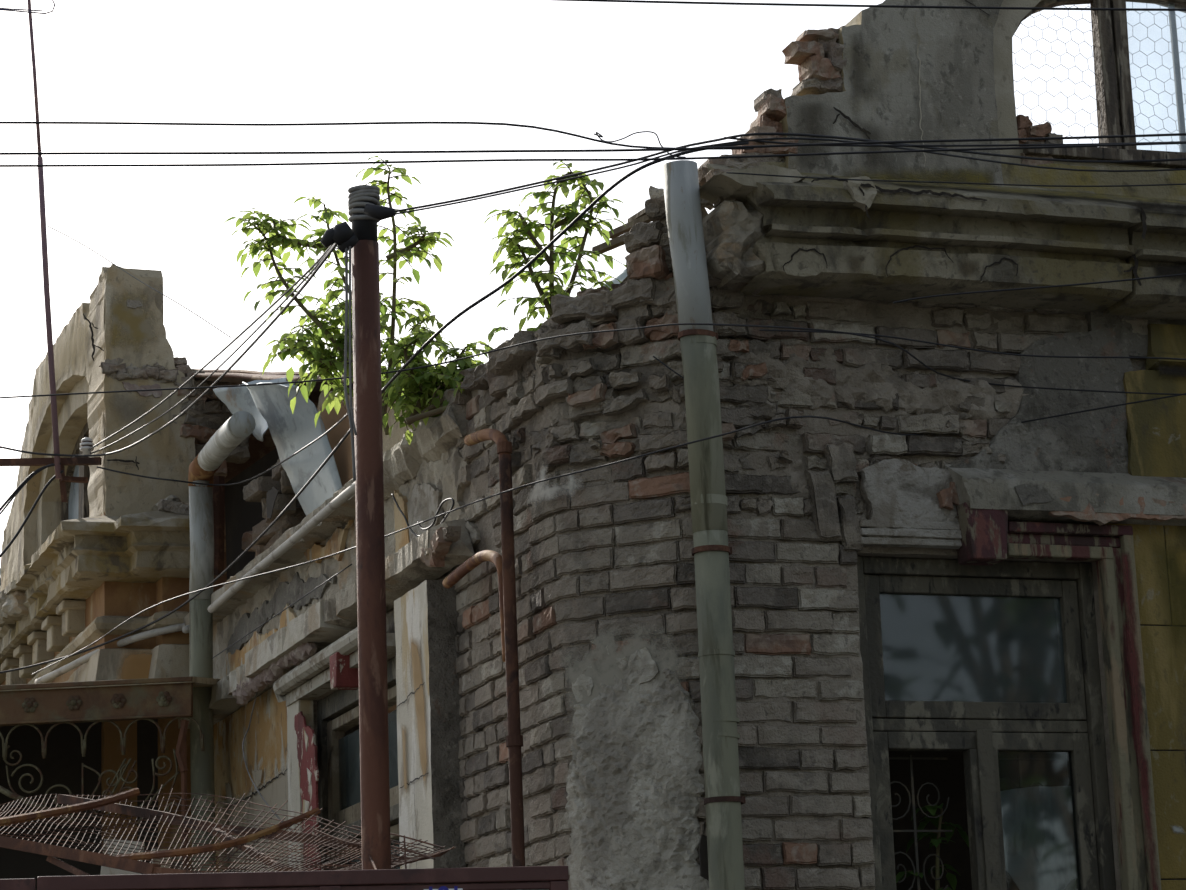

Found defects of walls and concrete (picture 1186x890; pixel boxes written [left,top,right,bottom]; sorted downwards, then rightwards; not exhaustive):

spalling [698,25,847,211]
spalling [99,357,233,457]
spalling [214,436,306,580]
spalling [394,186,709,890]
spalling [708,273,1088,890]
peeling [218,711,321,873]